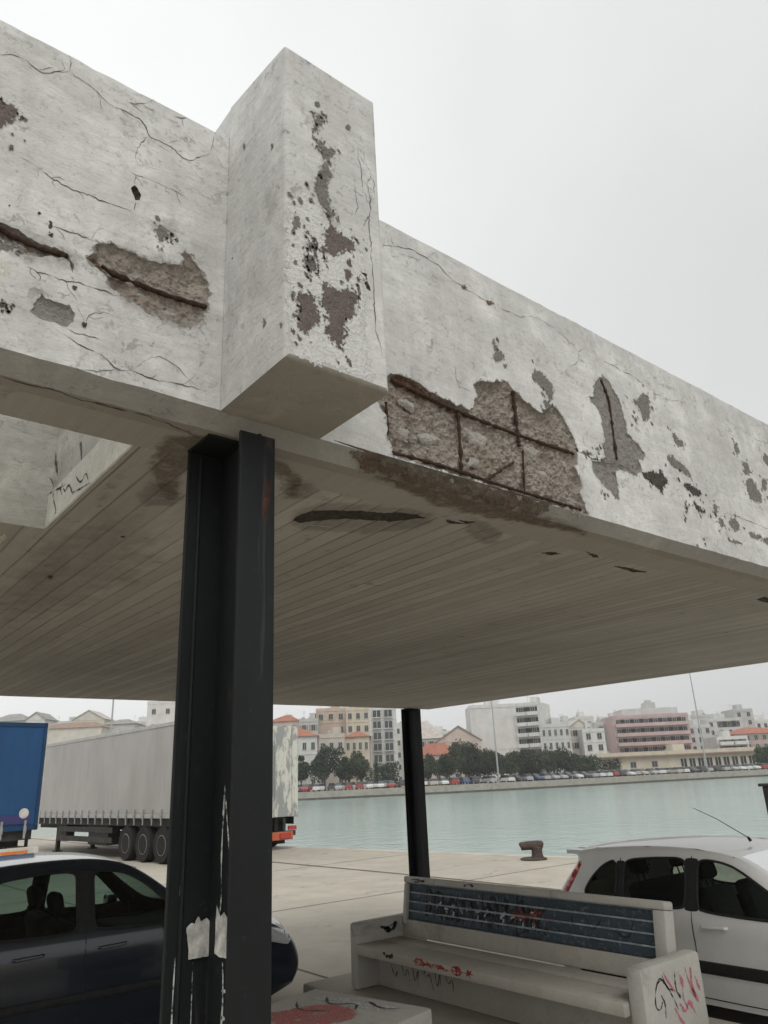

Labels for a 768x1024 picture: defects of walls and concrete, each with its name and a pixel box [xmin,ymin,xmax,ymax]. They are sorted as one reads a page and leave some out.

peeling [0,96,28,150]
crack [1,52,222,211]
spalling [0,211,78,290]
spalling [30,293,87,327]
crack [27,266,204,391]
spalling [85,215,213,329]
crack [354,155,683,402]
spalling [279,101,768,545]